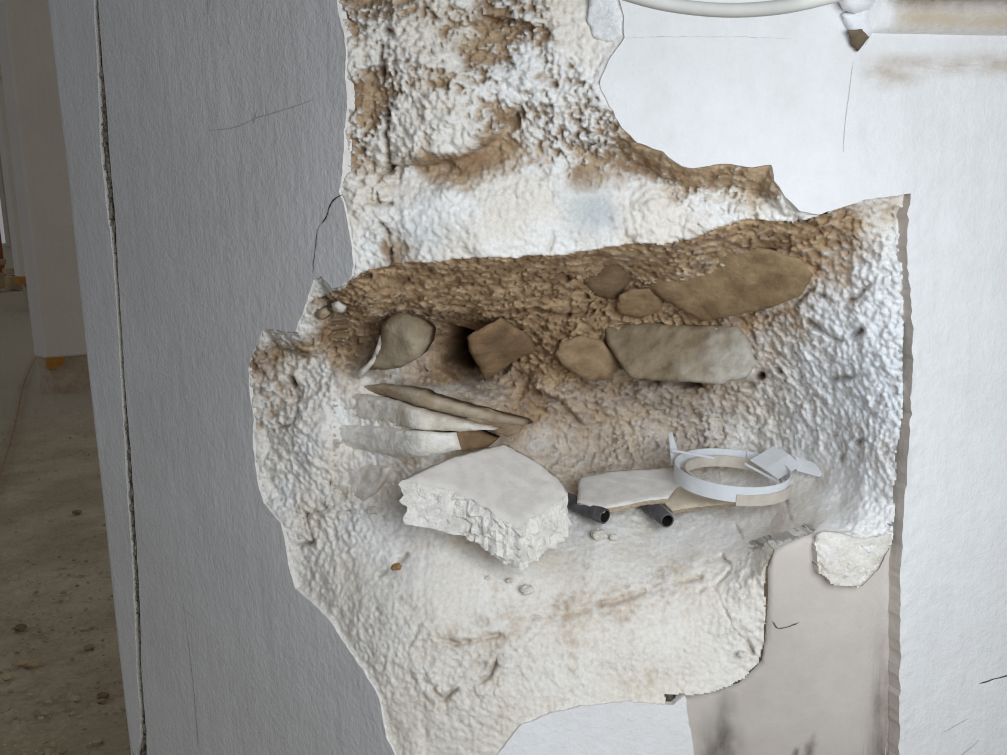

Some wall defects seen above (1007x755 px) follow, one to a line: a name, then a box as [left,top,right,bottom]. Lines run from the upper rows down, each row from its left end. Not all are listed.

crack [96,3,147,755]
crack [208,99,313,131]
crack [313,194,343,264]
spalling [249,0,904,755]